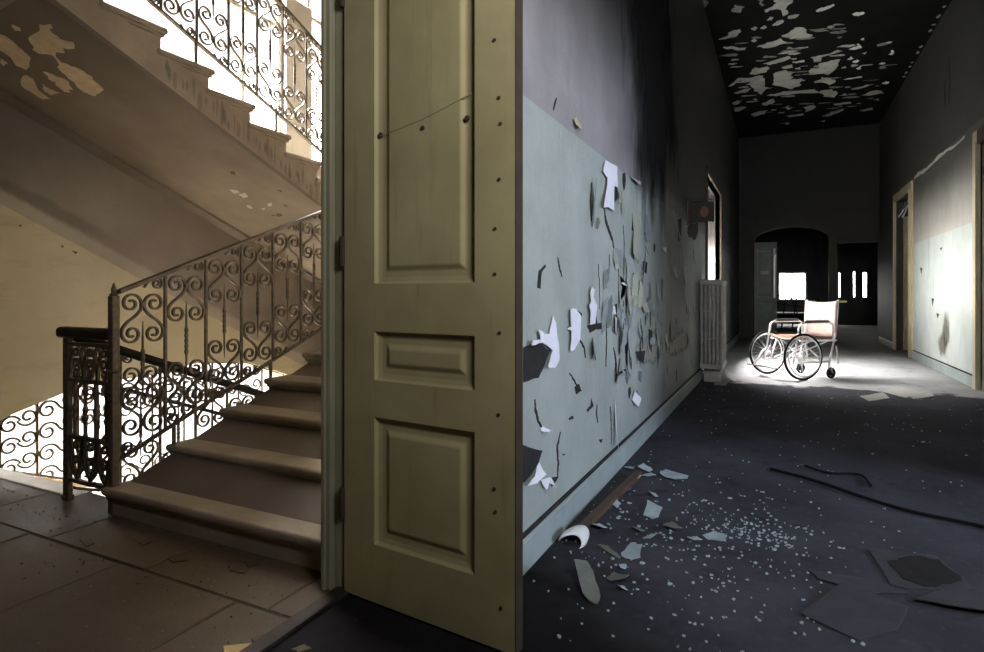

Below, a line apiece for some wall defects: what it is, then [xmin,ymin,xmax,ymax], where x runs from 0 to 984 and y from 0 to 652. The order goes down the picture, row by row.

flaking render [0,24,104,100]
flaking render [718,0,923,125]
peeling [523,160,698,407]
peeling [523,399,565,490]